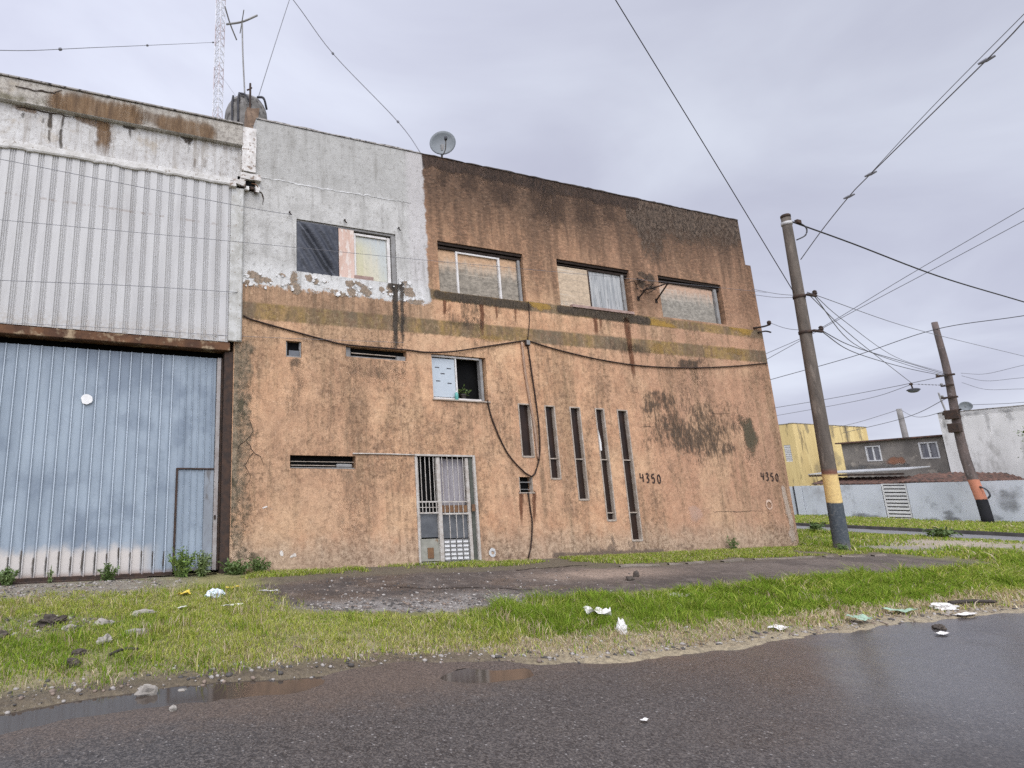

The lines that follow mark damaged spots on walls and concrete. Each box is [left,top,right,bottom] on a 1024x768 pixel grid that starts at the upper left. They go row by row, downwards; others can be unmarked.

corrosion [49,92,214,147]
damp [422,155,741,290]
peeling [243,270,425,305]
crack [237,420,264,485]
damp [643,390,758,463]